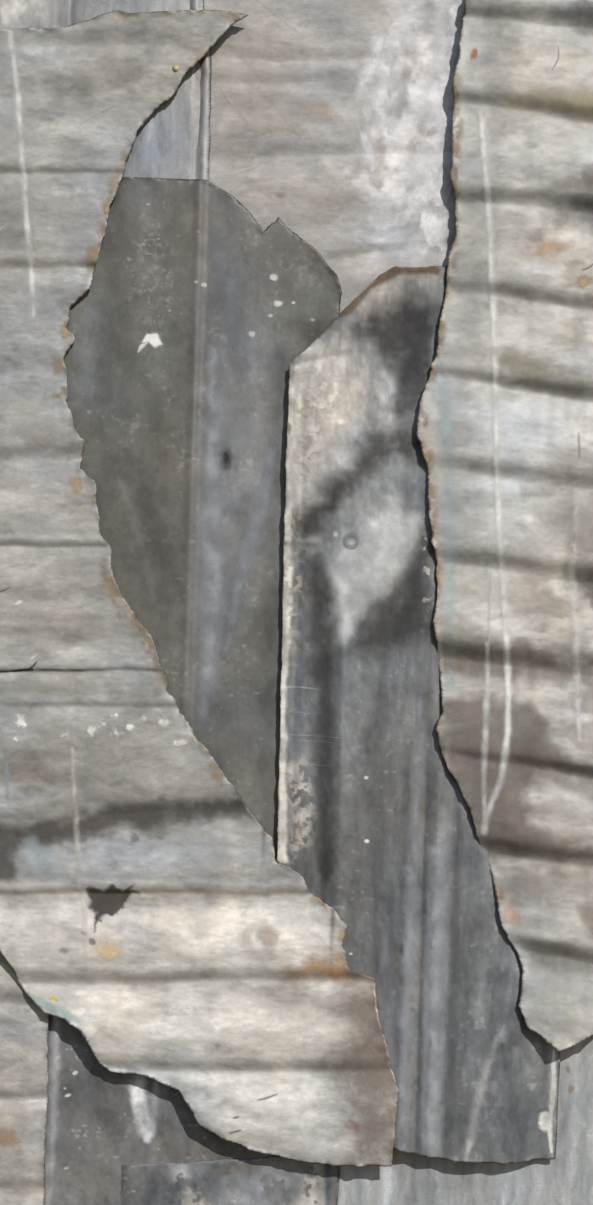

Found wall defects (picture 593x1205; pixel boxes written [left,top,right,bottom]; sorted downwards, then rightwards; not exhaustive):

damp [366,300,431,412]
peeling [278,365,333,862]
damp [293,441,425,879]
peeling [87,714,168,736]
peeling [87,884,140,926]
damp [412,838,442,1013]
damp [425,1028,440,1156]
peeling [539,1050,556,1153]